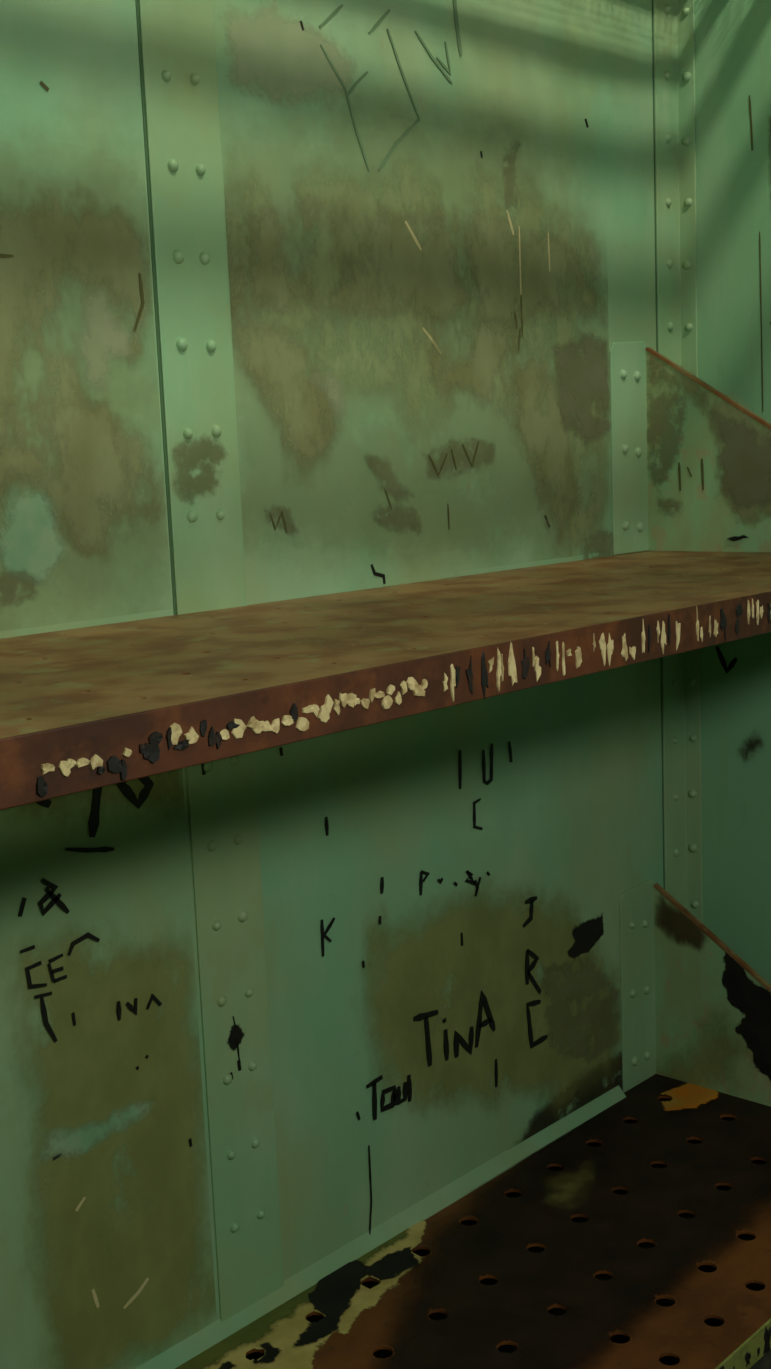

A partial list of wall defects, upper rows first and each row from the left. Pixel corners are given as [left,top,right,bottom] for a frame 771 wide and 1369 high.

peeling [230,8,350,99]
peeling [174,440,224,499]
peeling [647,360,771,522]
peeling [36,598,771,798]
peeling [722,948,771,1080]
peeling [175,1220,426,1369]
peeling [719,1326,771,1369]